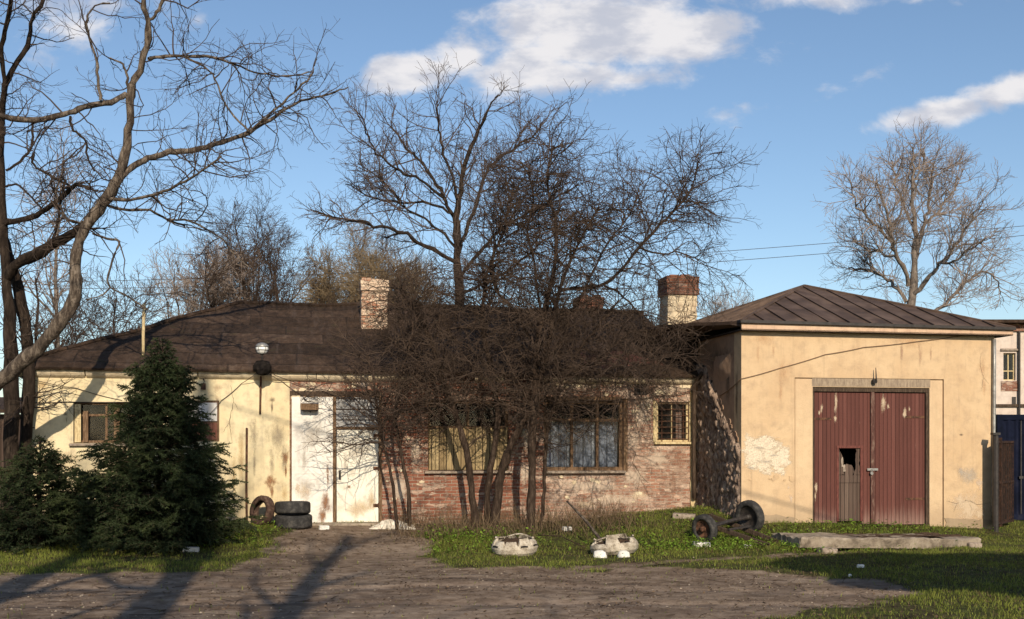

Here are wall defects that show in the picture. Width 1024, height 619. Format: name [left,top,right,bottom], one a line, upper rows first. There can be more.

flaking render [628,357,794,518]